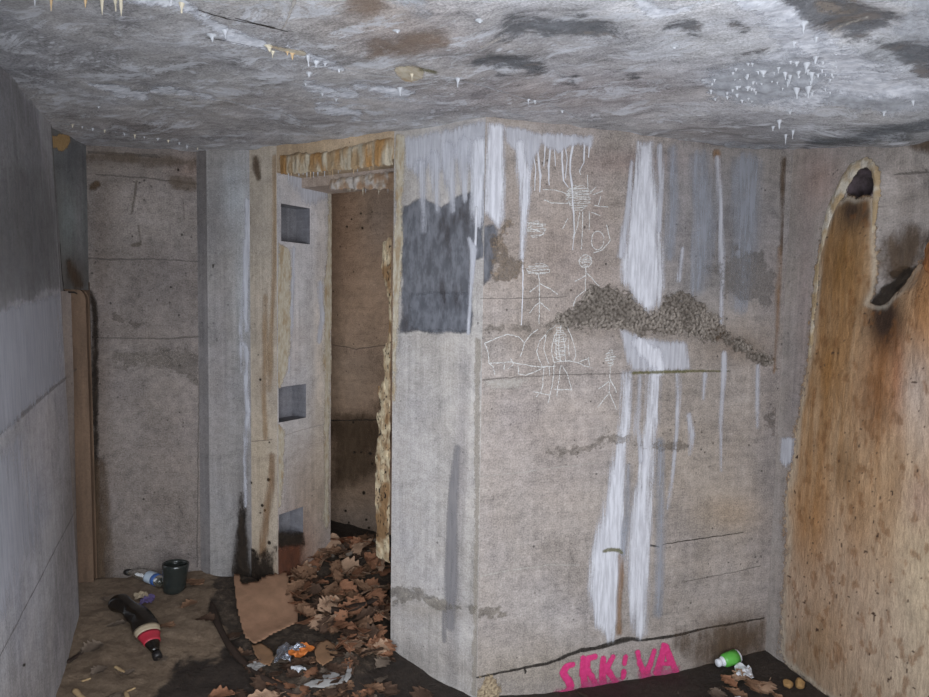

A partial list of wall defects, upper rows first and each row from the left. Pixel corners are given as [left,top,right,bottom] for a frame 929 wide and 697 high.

leakage [88,83,215,101]
leakage [117,0,344,71]
leakage [303,66,436,121]
leakage [634,0,711,19]
leakage [701,0,929,151]
leakage [619,142,664,310]
leakage [715,157,725,324]
leakage [278,122,593,563]
leakage [719,352,727,461]
leakage [589,331,694,642]
crack [476,617,764,678]